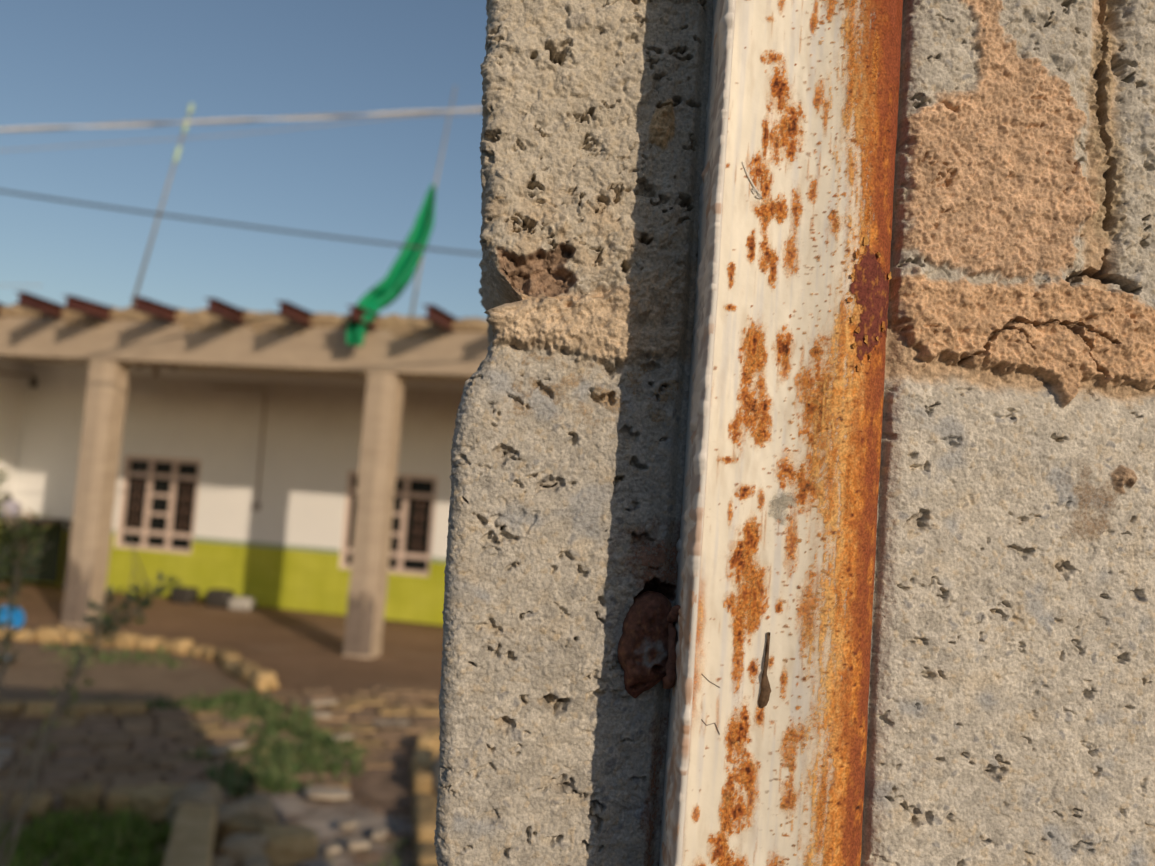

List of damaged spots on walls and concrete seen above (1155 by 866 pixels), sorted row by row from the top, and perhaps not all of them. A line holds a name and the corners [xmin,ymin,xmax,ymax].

crack [1065,0,1143,295]
spalling [494,241,580,299]
crack [957,316,1122,380]
corrosion [717,0,903,866]
corrosion [693,597,704,701]
corrosion [699,706,772,866]